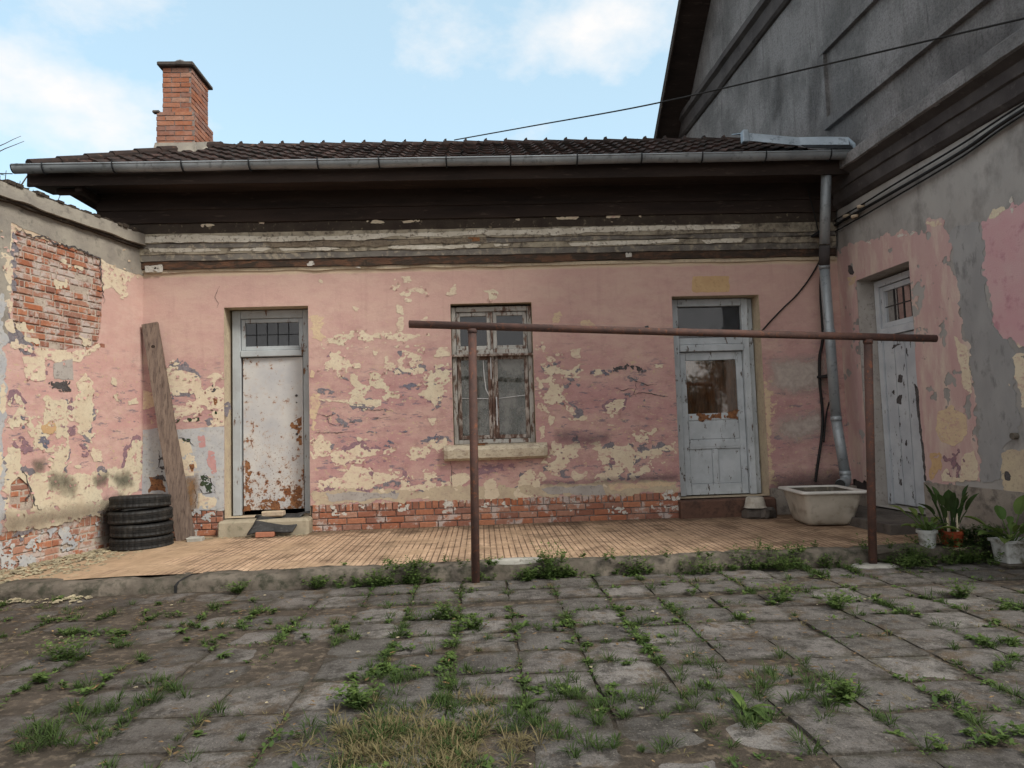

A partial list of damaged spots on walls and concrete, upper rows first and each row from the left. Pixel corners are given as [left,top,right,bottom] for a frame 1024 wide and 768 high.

spalling [0,215,744,570]
peeling [836,217,981,485]
peeling [981,196,1024,408]